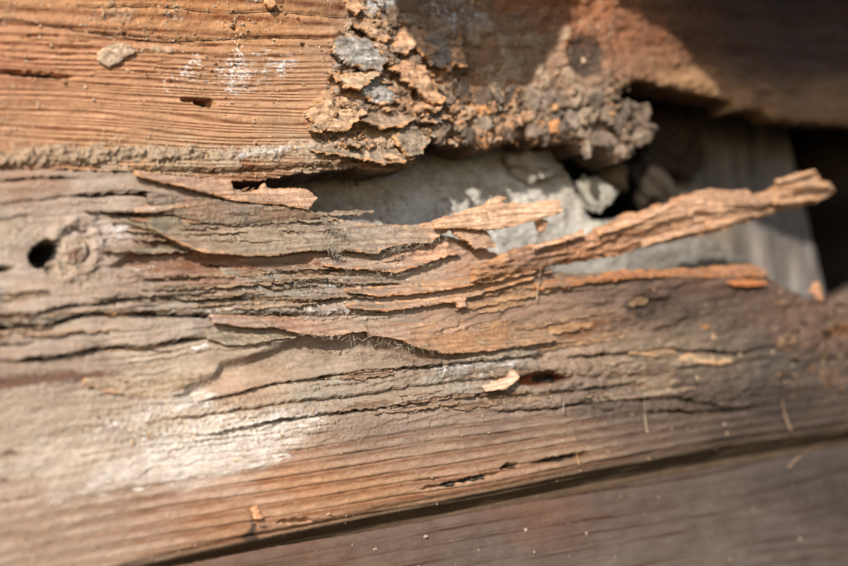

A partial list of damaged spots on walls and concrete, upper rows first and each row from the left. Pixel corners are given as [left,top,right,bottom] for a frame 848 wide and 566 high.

spalling [304,0,659,166]
crack [0,176,153,217]
crack [0,275,300,362]
crack [568,353,649,361]
crack [674,347,767,355]
crack [211,403,409,434]
crack [193,356,533,404]
crack [478,382,772,414]